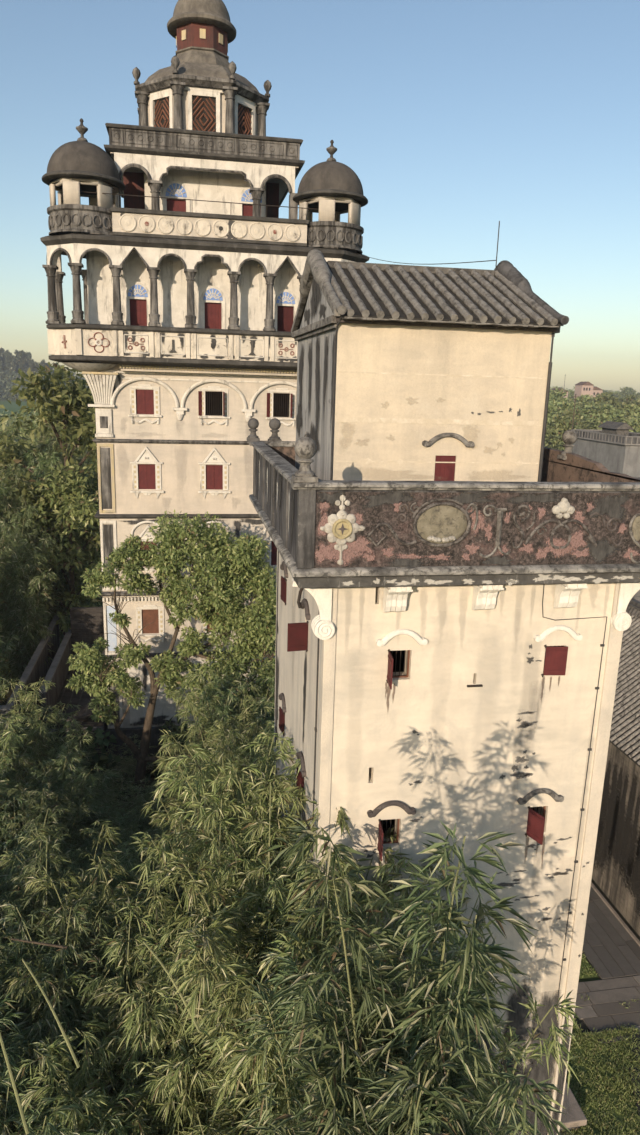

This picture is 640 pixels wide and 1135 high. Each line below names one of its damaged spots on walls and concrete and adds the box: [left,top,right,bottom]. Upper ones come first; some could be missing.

water stain [319,492,343,506]
water stain [450,492,561,504]
water stain [483,555,514,566]
water stain [373,558,492,585]
water stain [533,574,633,583]
spalling [516,711,538,728]
spalling [499,750,535,779]
water stain [594,760,640,916]